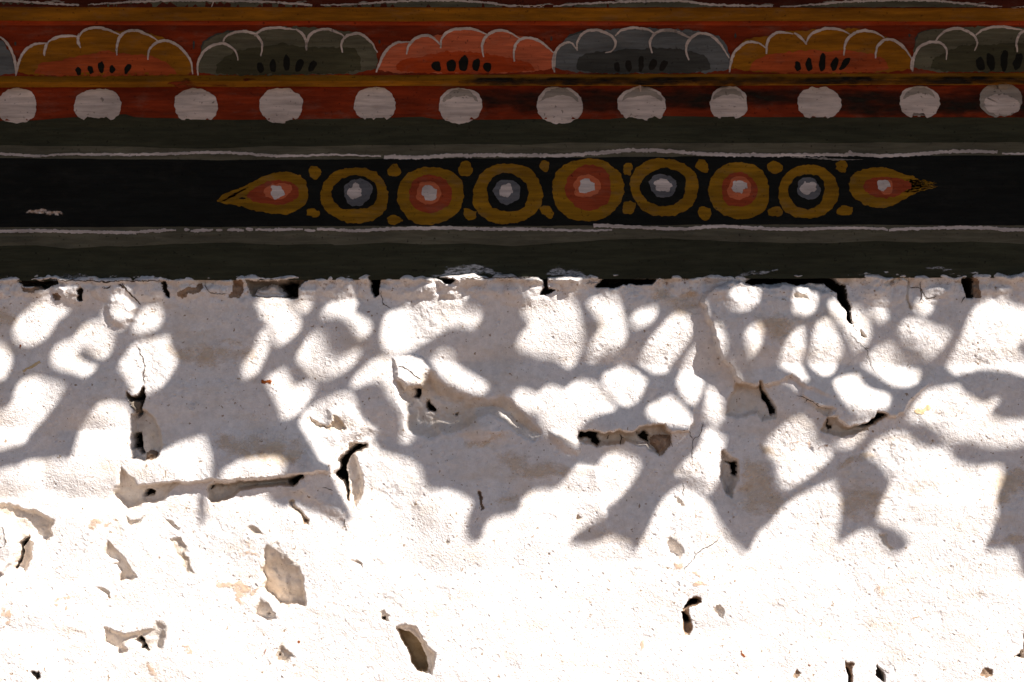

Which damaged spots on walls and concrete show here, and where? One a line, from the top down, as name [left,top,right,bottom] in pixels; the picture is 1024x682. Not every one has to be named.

peeling [177,283,204,299]
spalling [229,280,308,299]
peeling [971,277,982,298]
spalling [126,387,146,413]
spalling [396,369,541,441]
spalling [578,425,672,456]
spalling [111,468,181,528]
spalling [720,450,740,498]
spalling [96,540,137,599]
spalling [217,526,307,623]
spalling [666,534,706,635]
spalling [101,620,167,675]